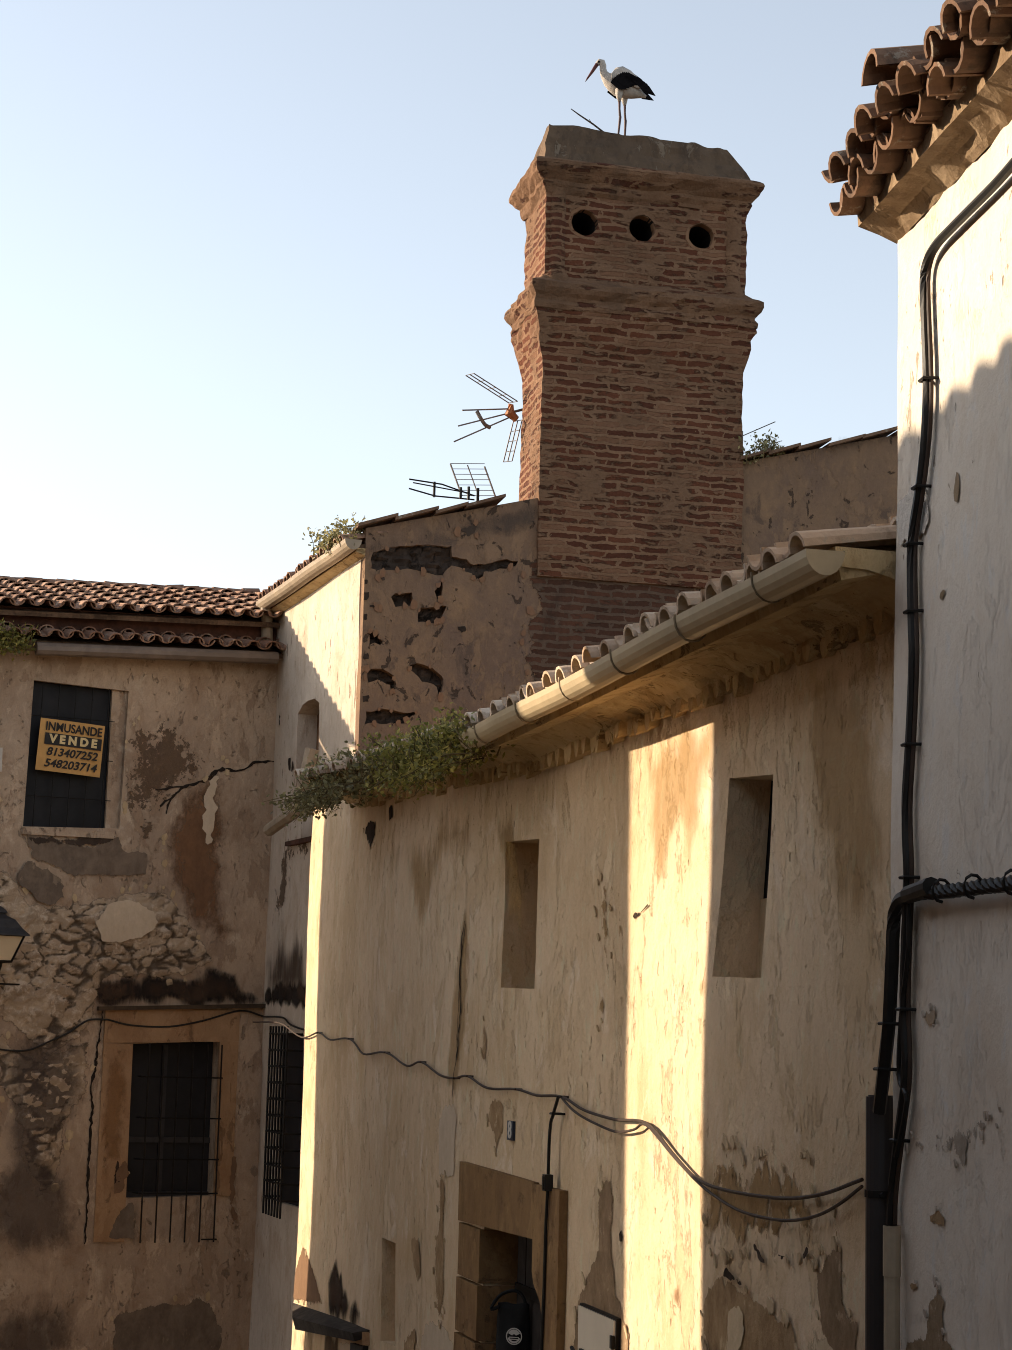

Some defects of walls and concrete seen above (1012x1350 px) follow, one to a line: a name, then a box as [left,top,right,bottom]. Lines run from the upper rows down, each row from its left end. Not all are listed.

flaking render [362,519,694,727]
crack [155,760,274,814]
flaking render [0,715,229,1194]
damp [96,943,306,1008]
damp [0,1036,74,1248]
flaking render [110,1291,222,1350]
flaking render [293,1248,322,1305]
flaking render [573,1181,628,1350]
flaking render [700,1133,857,1350]
flaking render [906,1274,952,1350]